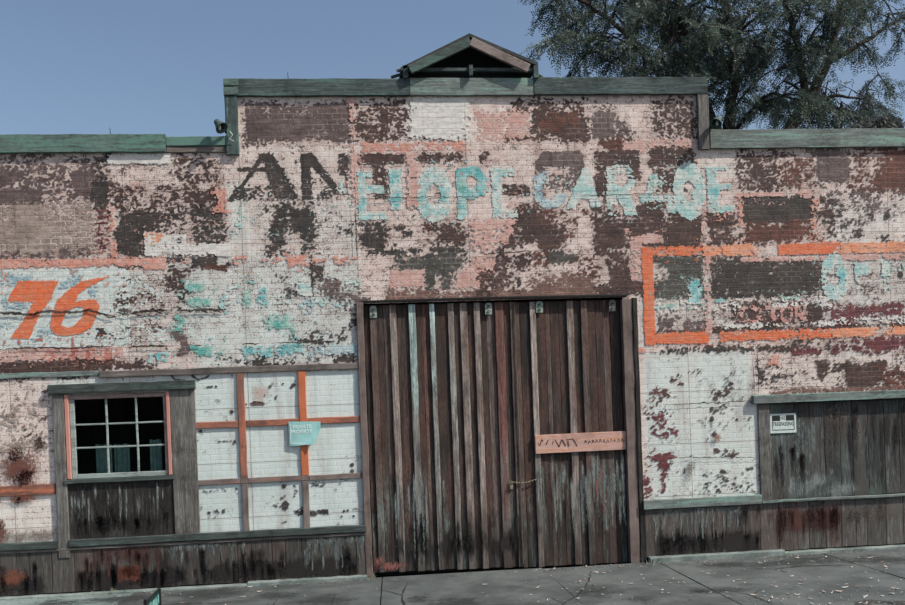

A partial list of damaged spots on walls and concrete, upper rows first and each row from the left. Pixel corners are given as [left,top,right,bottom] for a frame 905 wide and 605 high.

peeling [0,153,256,460]
peeling [216,95,905,498]
corrosion [0,447,40,506]
leakage [0,536,365,605]
peeling [266,482,329,523]
leakage [395,475,522,565]
leakage [538,456,626,531]
leakage [654,506,761,567]
leakage [775,407,905,497]